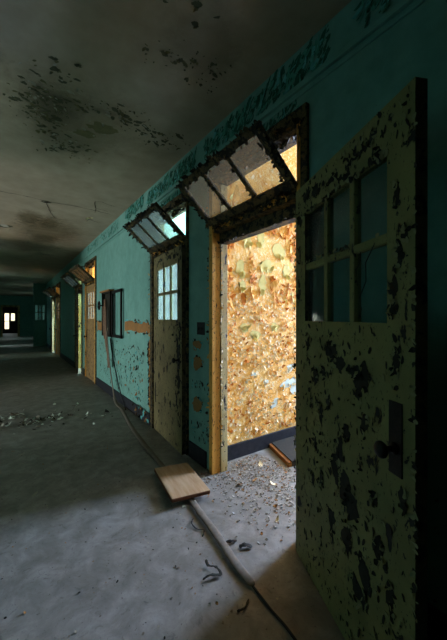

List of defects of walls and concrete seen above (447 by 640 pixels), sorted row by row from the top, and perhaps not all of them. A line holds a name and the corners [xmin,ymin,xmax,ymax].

peeling [3,56,191,159]
peeling [386,210,419,320]
peeling [88,24,405,635]